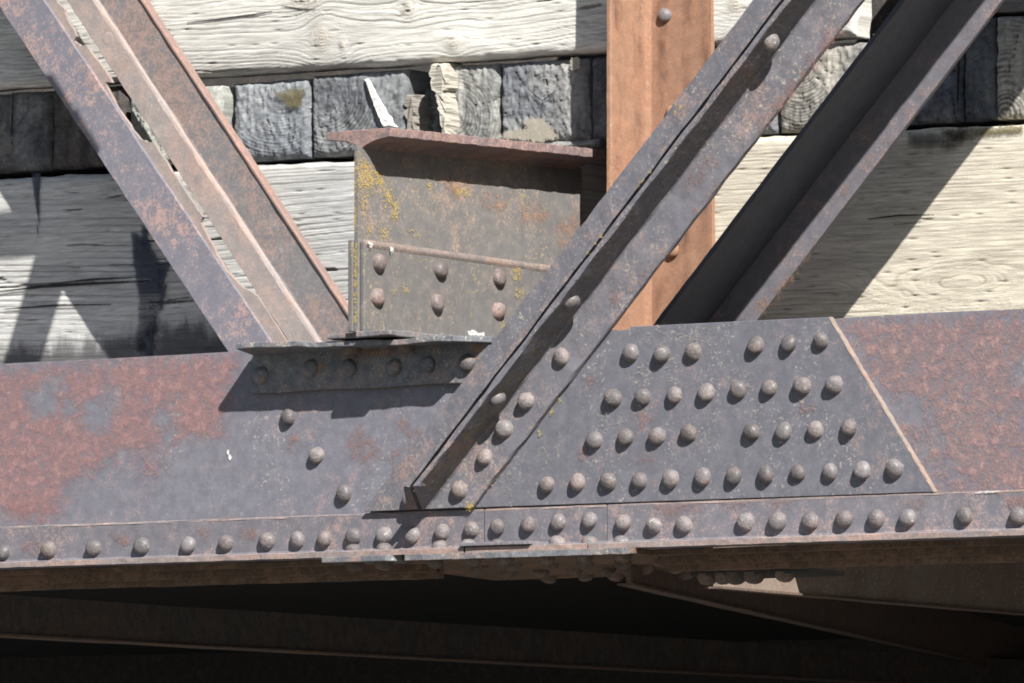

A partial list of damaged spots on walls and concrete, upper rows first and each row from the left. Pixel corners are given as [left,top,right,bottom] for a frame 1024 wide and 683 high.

rust [46,0,288,342]
rust [0,352,244,525]
rust [840,310,1024,507]